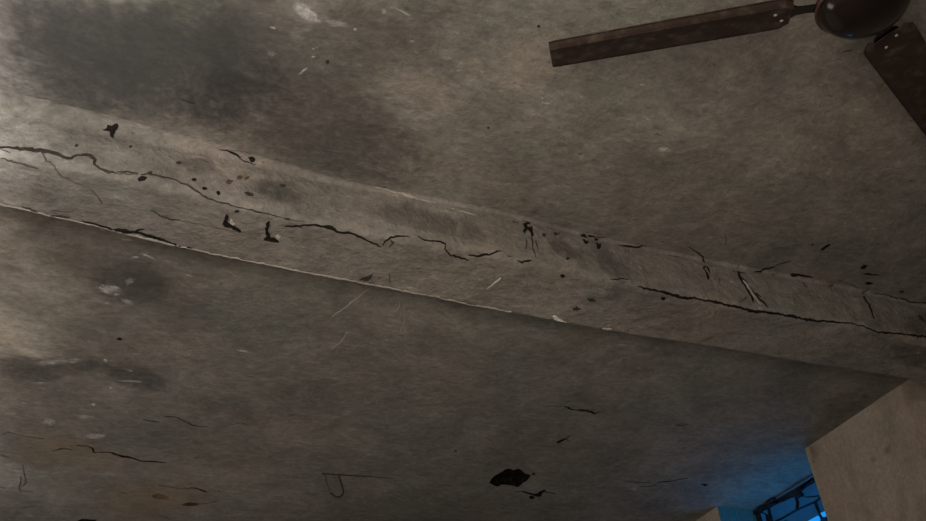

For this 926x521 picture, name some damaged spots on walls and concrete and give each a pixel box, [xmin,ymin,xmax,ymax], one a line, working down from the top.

spalling [103,123,119,138]
crack [0,146,538,263]
peeling [0,203,511,312]
crack [610,247,926,338]
crack [550,406,606,414]
crack [0,432,165,508]
spalling [490,469,556,499]